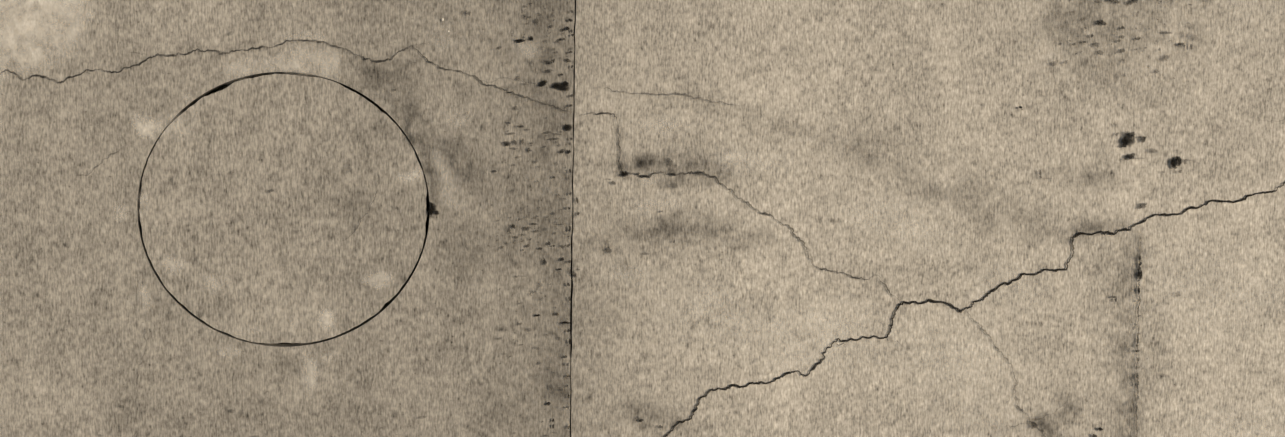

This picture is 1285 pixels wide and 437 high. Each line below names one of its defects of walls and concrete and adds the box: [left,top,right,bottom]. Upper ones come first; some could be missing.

crack [8,39,523,97]
crack [596,112,655,178]
crack [665,171,1285,437]